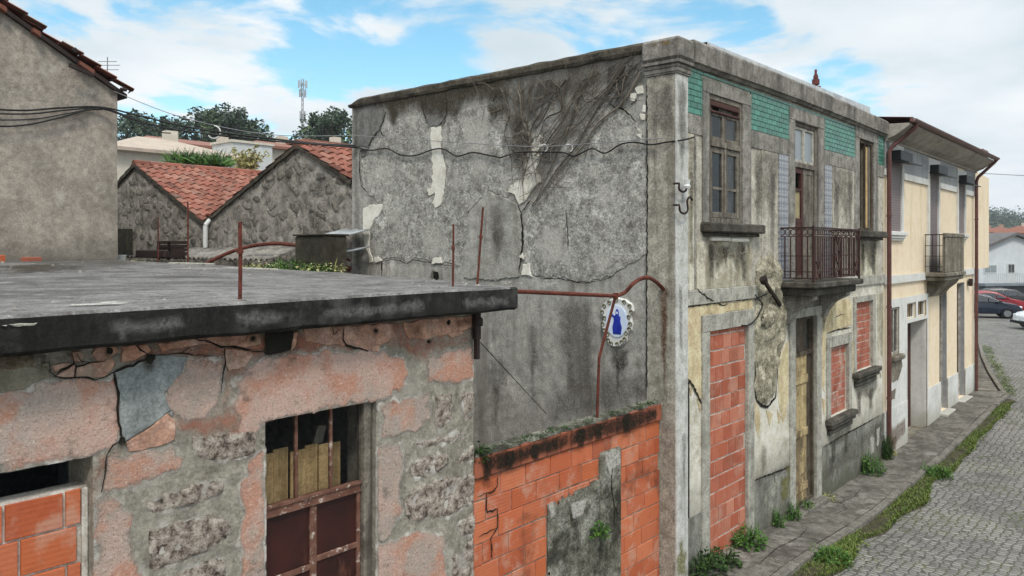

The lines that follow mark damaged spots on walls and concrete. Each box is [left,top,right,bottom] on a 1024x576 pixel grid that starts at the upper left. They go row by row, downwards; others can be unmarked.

crack [359,111,387,193]
spalling [352,63,647,282]
crack [377,252,459,277]
crack [518,201,618,284]
crack [609,86,648,387]
crack [332,327,368,352]
spalling [688,254,789,436]
crack [49,339,266,492]
damp [577,424,602,448]
damp [605,450,620,473]
crack [478,477,499,558]